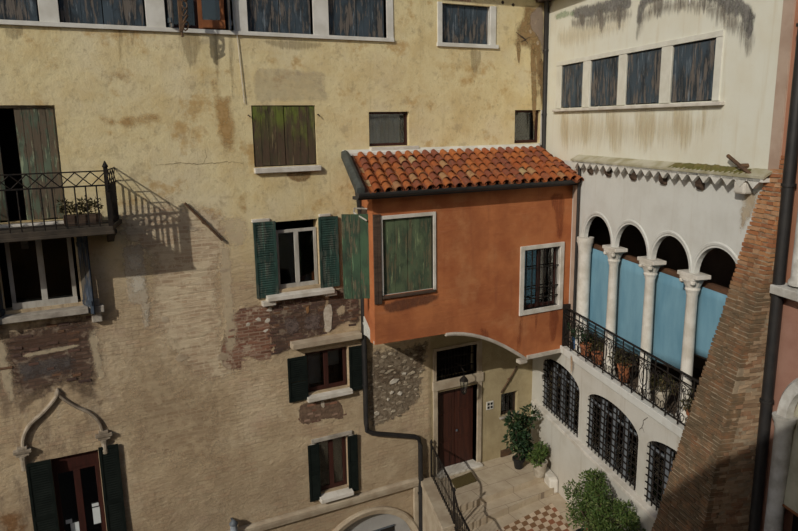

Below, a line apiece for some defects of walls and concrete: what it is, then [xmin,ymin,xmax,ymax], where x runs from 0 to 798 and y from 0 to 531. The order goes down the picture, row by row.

damp [556,0,755,46]
damp [517,7,543,126]
peeling [121,202,361,379]
spalling [0,316,102,396]
spalling [294,397,348,429]